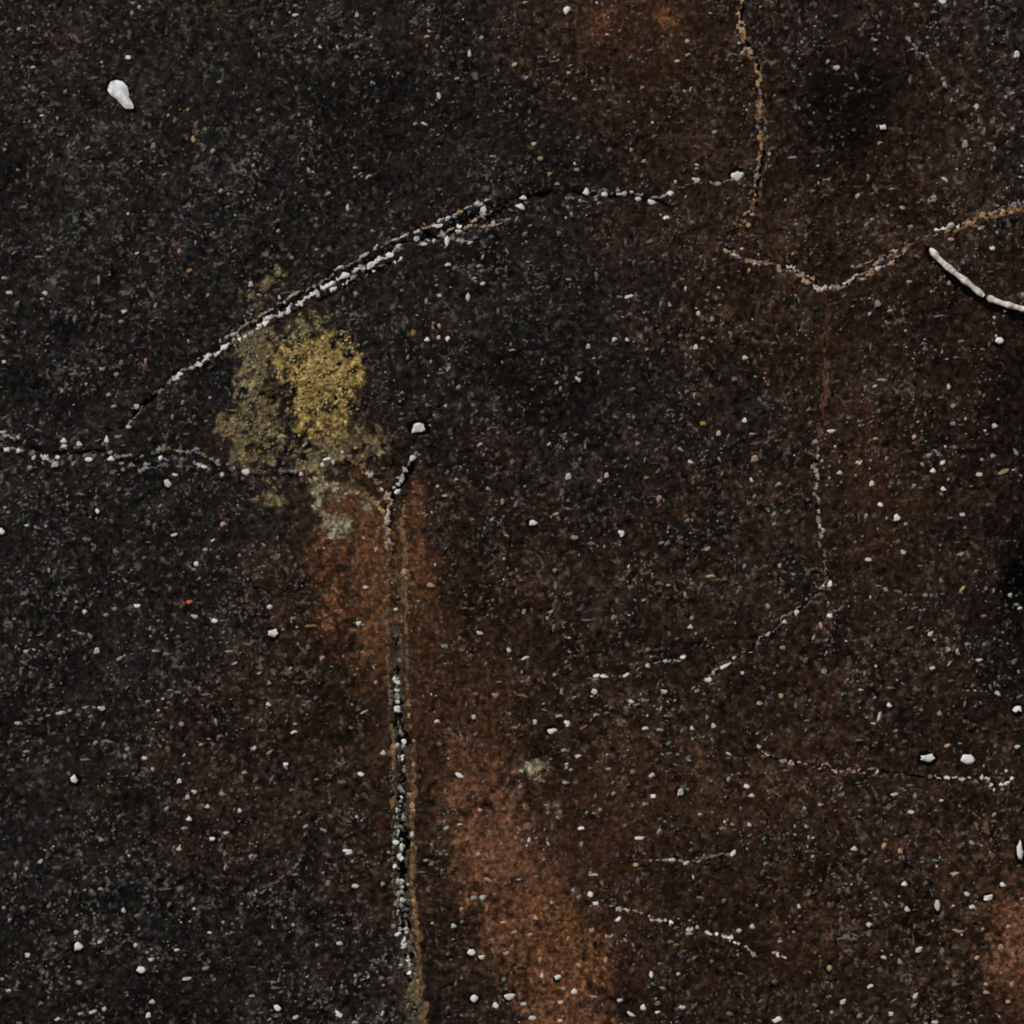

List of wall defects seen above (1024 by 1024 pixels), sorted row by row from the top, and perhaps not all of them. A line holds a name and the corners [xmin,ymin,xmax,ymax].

crack [0,179,733,1024]
corrosion [306,474,769,1024]
crack [690,0,1024,694]